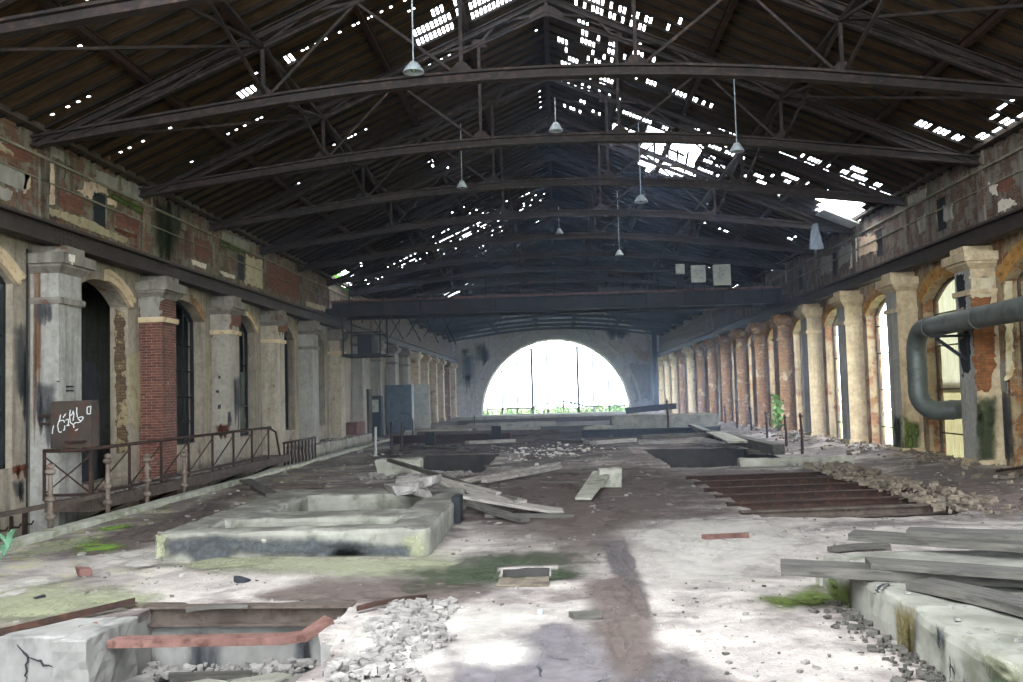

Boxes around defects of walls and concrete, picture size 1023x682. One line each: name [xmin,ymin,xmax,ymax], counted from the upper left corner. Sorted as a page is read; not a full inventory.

flaking render [0,142,33,201]
flaking render [49,146,153,243]
flaking render [988,177,1017,213]
flaking render [219,231,263,289]
water stain [37,304,52,325]
water stain [15,329,54,447]
flaking render [113,308,140,454]
flaking render [959,323,1015,394]
crack [17,645,52,681]